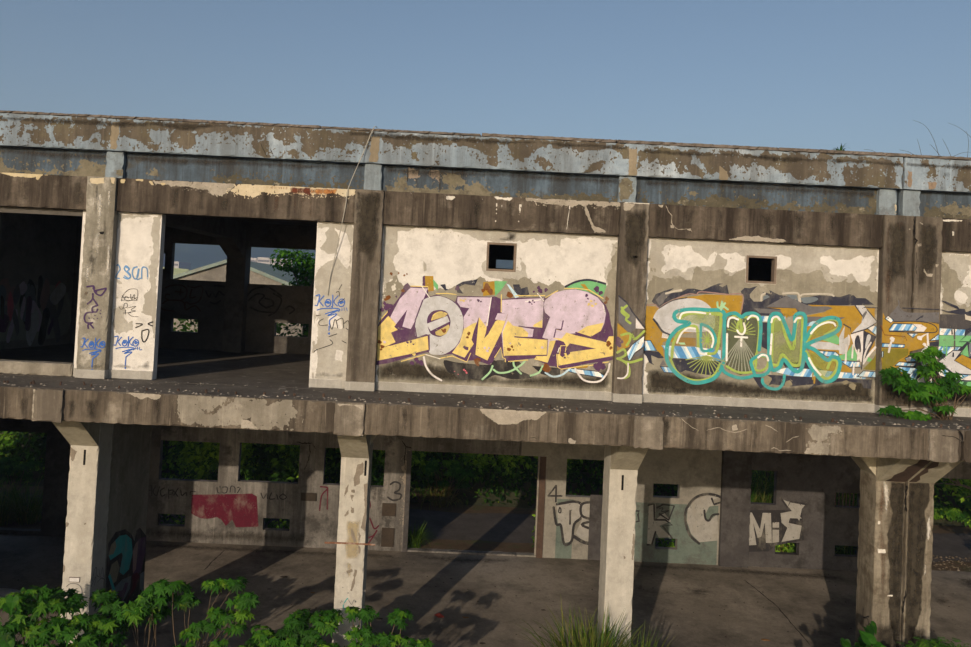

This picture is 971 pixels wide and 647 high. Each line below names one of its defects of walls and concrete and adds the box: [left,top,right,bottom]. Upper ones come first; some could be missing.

corrosion [283,187,336,195]
peeling [0,114,971,338]
crack [566,205,606,233]
peeling [312,223,354,380]
peeling [633,236,879,404]
peeling [376,315,613,392]
peeling [177,395,304,431]
spalling [480,408,546,425]
spalling [804,424,842,455]